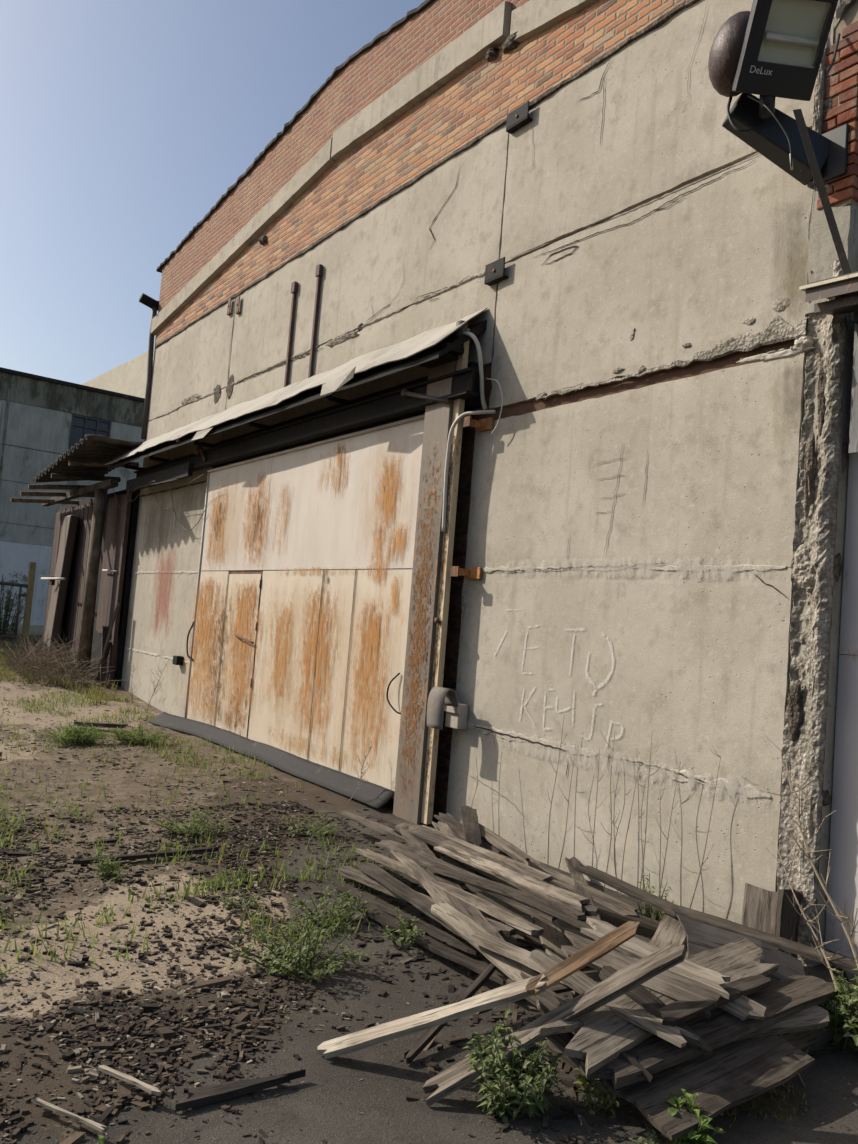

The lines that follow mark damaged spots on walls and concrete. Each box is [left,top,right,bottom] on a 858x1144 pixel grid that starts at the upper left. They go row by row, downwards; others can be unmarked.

crack [513,153,759,266]
crack [363,271,470,327]
crack [226,315,321,398]
crack [485,446,667,572]
rust [183,427,456,801]
spalling [536,294,848,967]
crack [474,726,568,775]
crack [609,757,708,784]